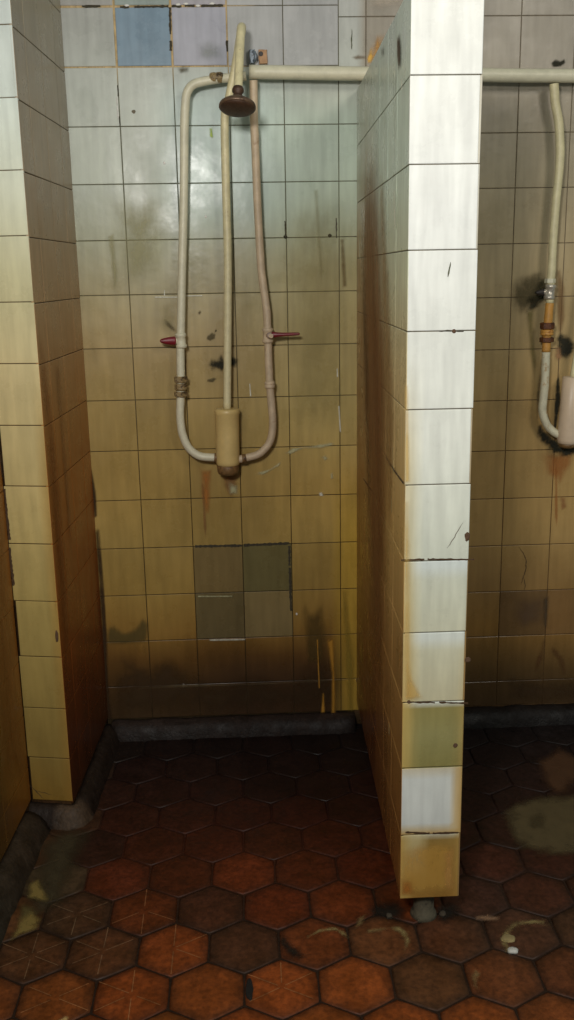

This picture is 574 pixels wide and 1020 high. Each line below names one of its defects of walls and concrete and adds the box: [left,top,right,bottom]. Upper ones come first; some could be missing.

leakage [516,277,546,329]
leakage [557,335,574,358]
leakage [208,357,237,382]